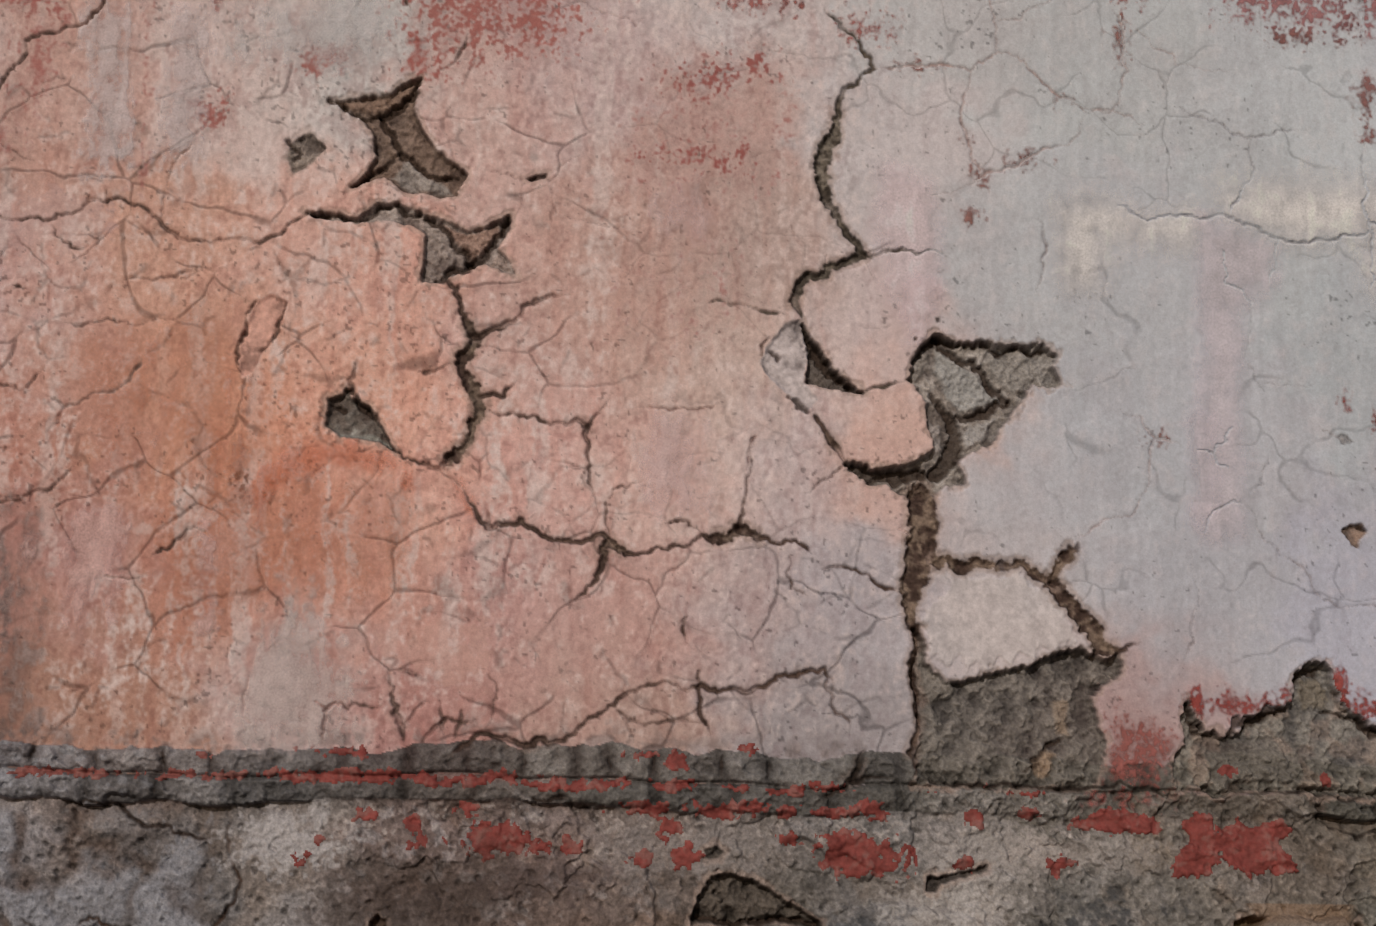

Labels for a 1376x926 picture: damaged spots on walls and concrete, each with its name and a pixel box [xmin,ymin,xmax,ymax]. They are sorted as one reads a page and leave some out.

crack [0,0,106,90]
crack [0,145,307,285]
flaking render [306,77,516,284]
crack [708,0,1230,321]
crack [1117,108,1376,392]
flaking render [325,388,397,452]
flaking render [760,319,866,414]
flaking render [843,333,1062,504]
crack [314,279,1376,811]
crack [61,745,243,926]
peeling [6,743,918,883]
flaking render [908,628,1376,880]